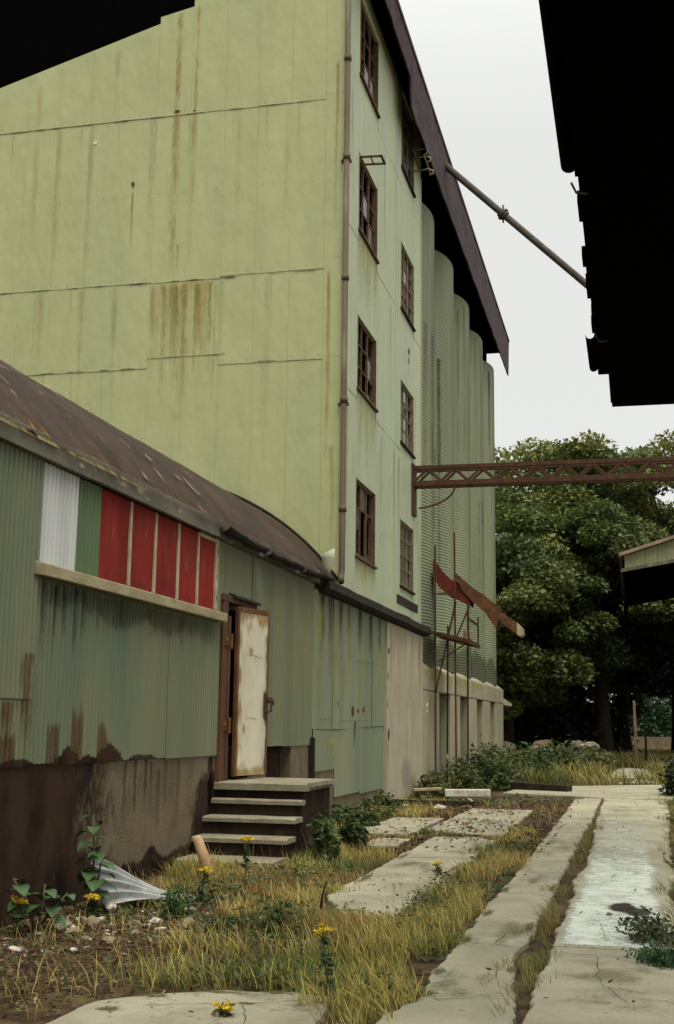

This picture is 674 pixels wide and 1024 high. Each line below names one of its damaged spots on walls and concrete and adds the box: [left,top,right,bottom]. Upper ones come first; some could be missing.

corrosion [162,280,208,360]
corrosion [0,759,37,769]
corrosion [52,744,157,765]
water stain [0,756,215,928]